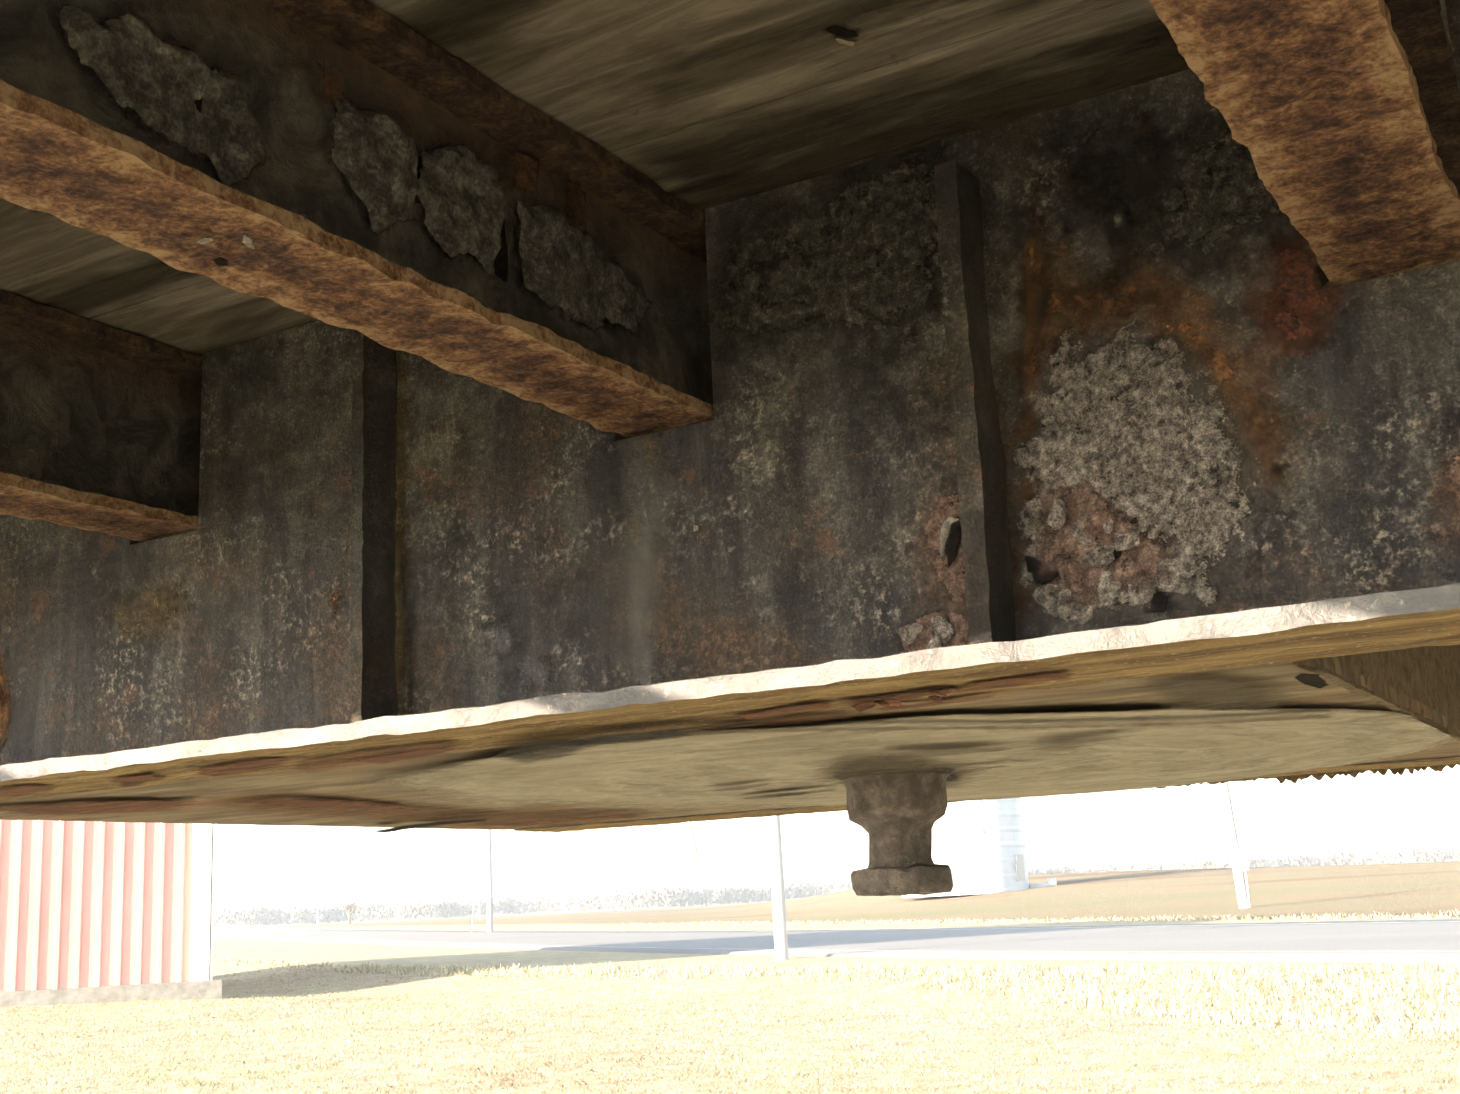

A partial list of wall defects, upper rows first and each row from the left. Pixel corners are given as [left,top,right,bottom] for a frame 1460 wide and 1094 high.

peeling [330,98,652,334]
peeling [1007,306,1266,627]